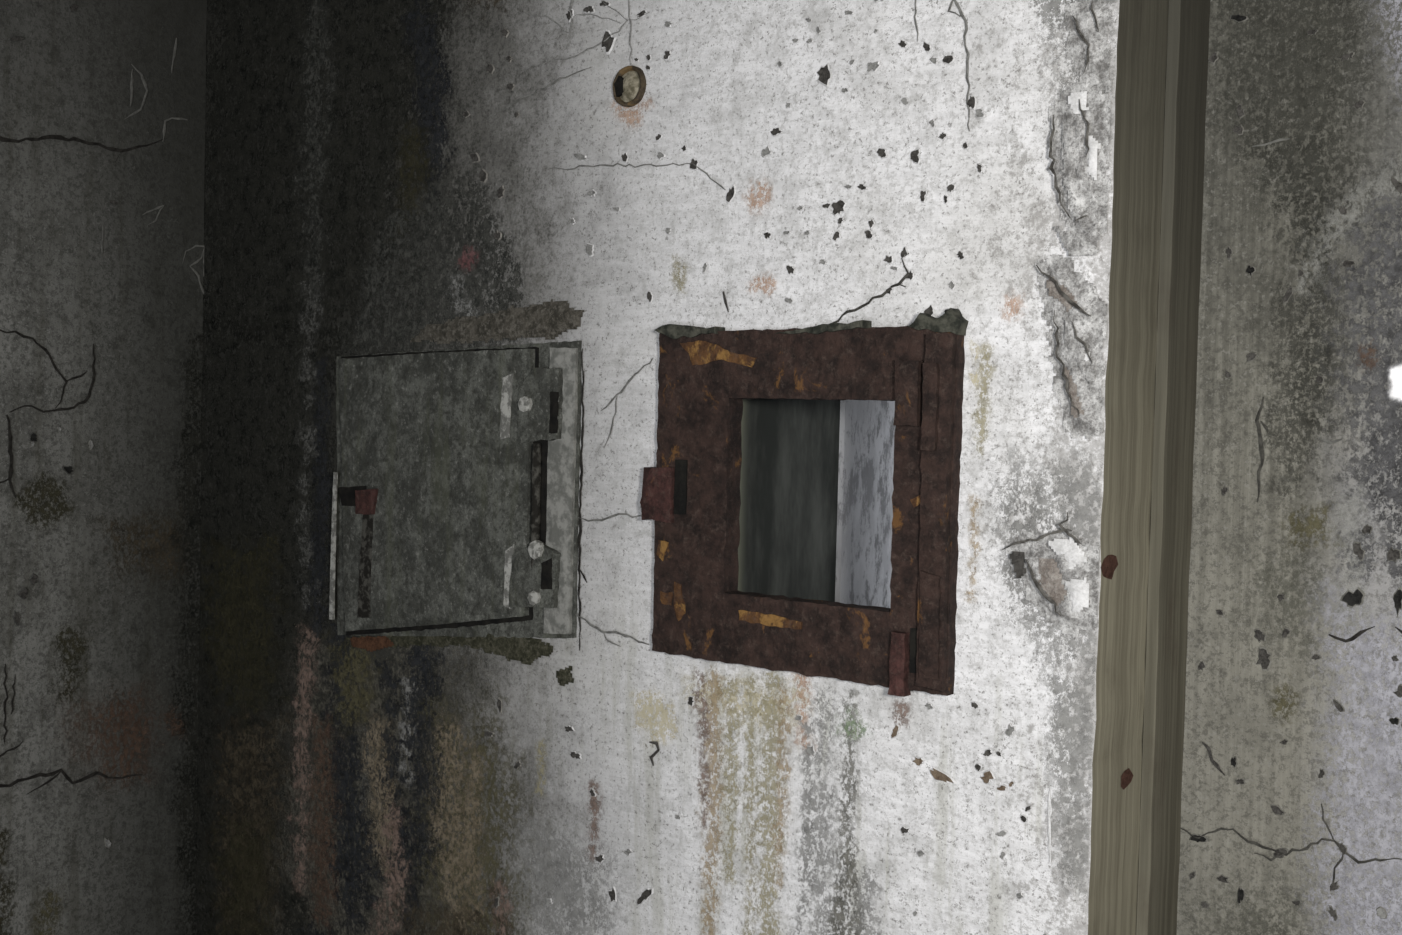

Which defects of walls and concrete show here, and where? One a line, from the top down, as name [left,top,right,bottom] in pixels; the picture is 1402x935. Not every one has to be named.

crack [914,0,970,131]
crack [830,253,909,324]
corrosion [680,341,757,367]
crack [0,330,96,498]
leakage [170,0,606,935]
corrosion [656,540,669,561]
corrosion [660,581,686,621]
corrosion [738,610,802,629]
crack [0,664,142,794]
leakage [892,703,909,726]
leakage [796,692,880,935]
crack [1180,804,1402,887]